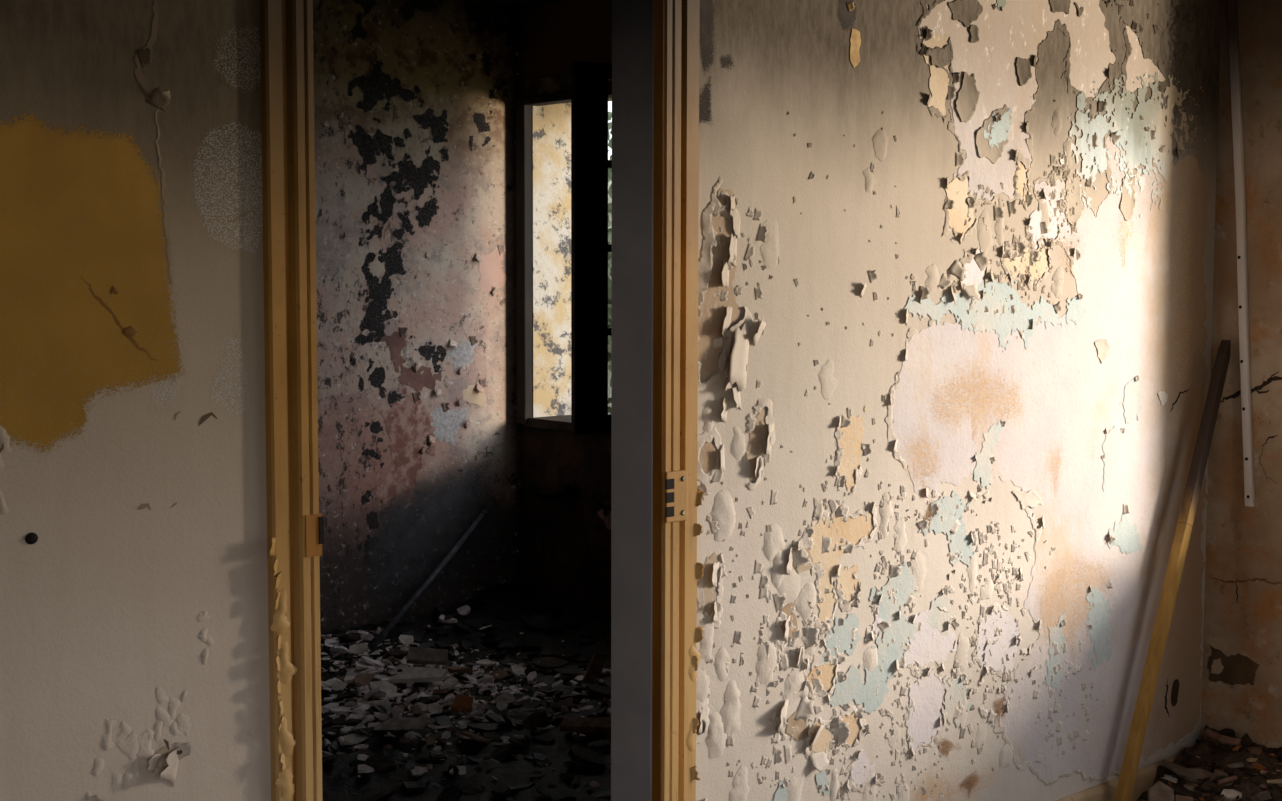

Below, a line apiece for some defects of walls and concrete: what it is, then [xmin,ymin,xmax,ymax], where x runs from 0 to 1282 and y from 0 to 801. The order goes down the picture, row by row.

peeling [475,245,508,296]
peeling [370,327,488,505]
peeling [686,0,1263,801]